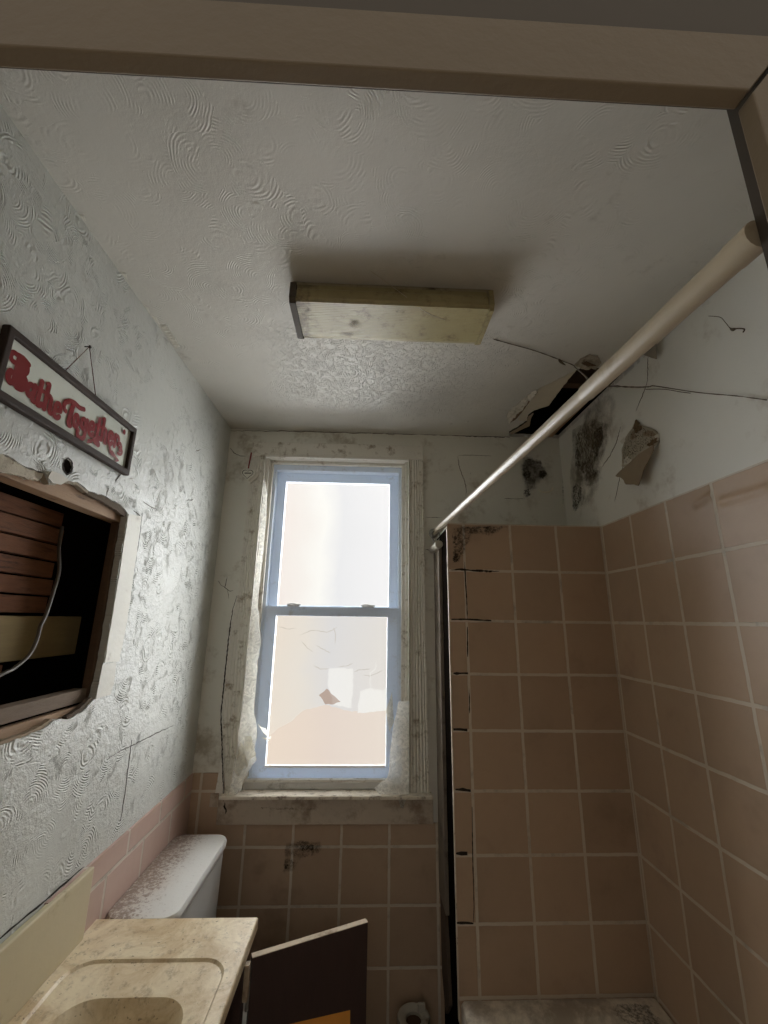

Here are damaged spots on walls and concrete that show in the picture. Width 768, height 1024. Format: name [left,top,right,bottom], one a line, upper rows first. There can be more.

mould [523,459,547,496]
water stain [563,405,603,510]
spalling [603,343,660,498]
hole [0,454,142,745]
crack [108,725,174,821]
crack [219,579,237,814]